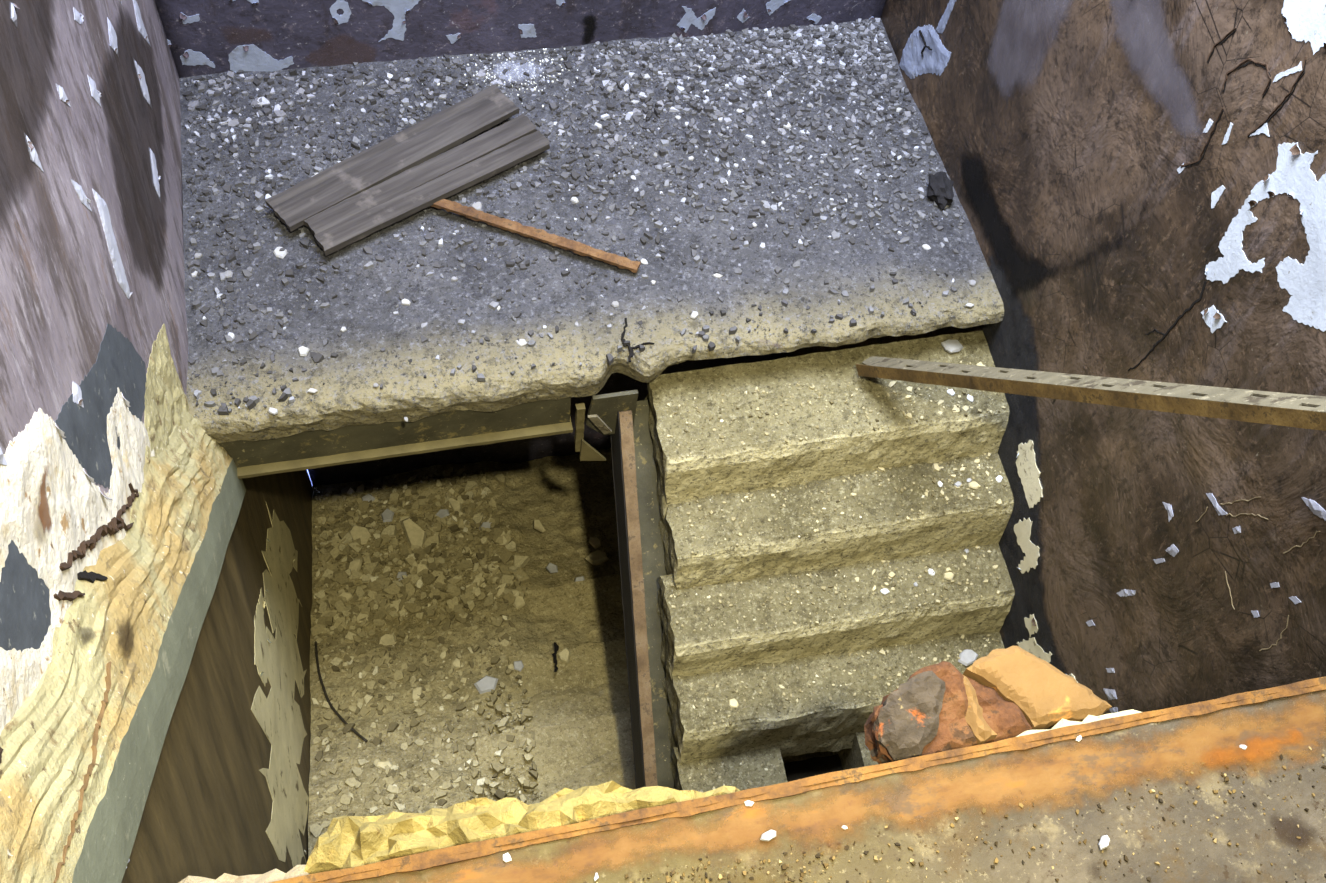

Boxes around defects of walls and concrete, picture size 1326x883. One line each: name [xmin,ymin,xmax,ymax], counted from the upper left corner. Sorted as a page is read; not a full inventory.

peeling [330,0,420,42]
peeling [1203,119,1233,144]
crack [1180,27,1307,168]
peeling [1273,0,1326,83]
peeling [70,179,133,299]
peeling [1205,123,1326,332]
crack [621,318,654,362]
crack [1128,281,1207,371]
peeling [1201,305,1227,333]
flaking render [0,323,189,764]
rust [53,661,112,883]
rust [409,697,1326,883]